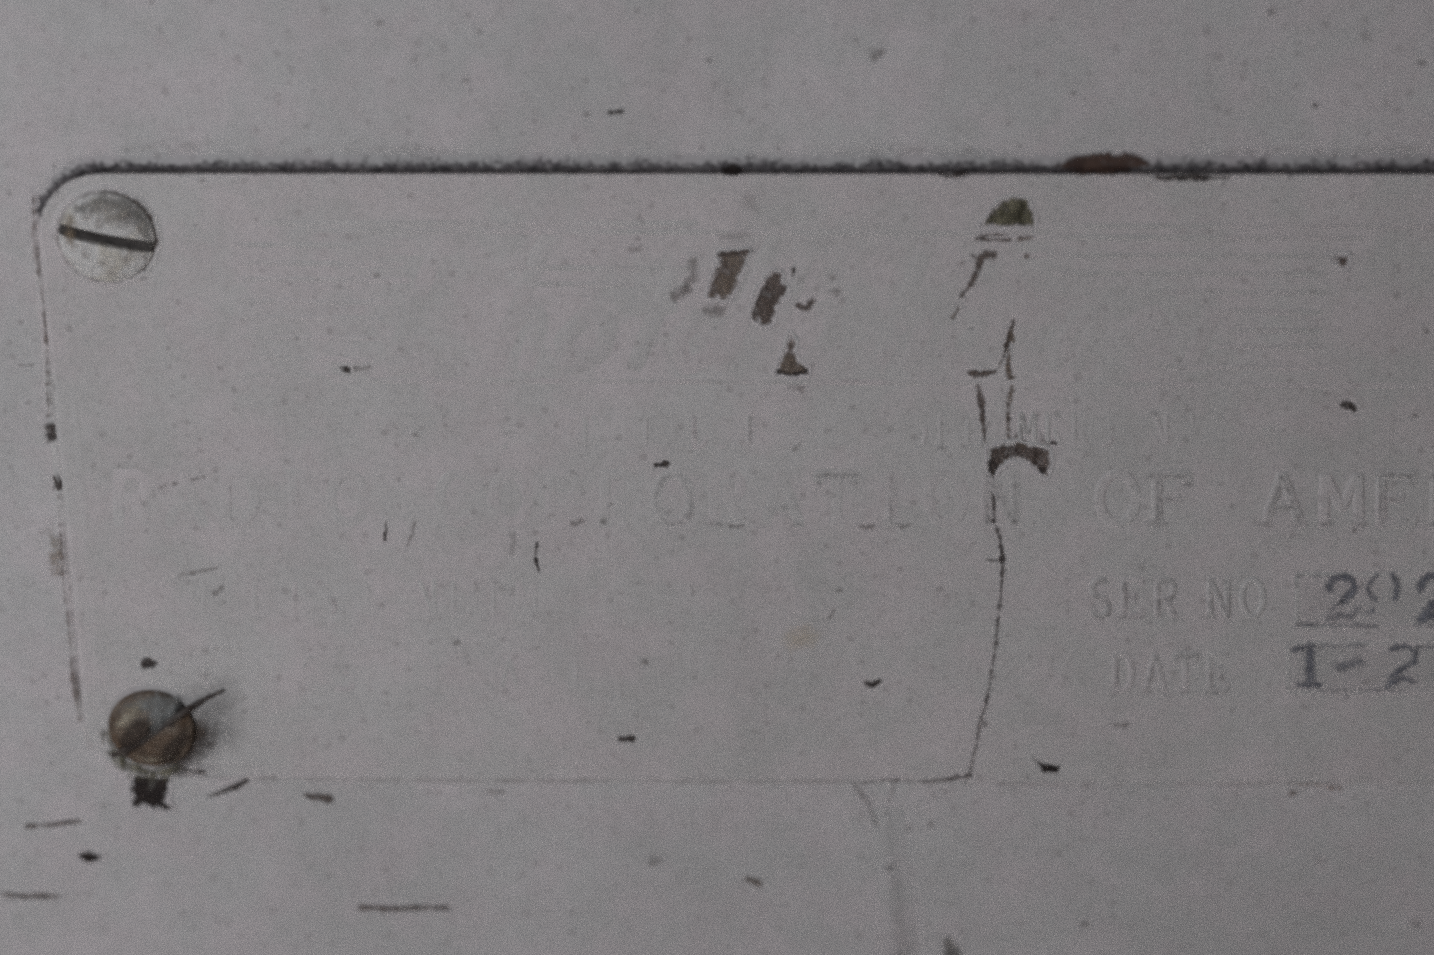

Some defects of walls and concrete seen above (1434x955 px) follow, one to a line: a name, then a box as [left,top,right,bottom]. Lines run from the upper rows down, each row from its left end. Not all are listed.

peeling [704,245,813,381]
peeling [951,194,1040,318]
crack [863,387,1013,784]
corrosion [104,722,213,779]